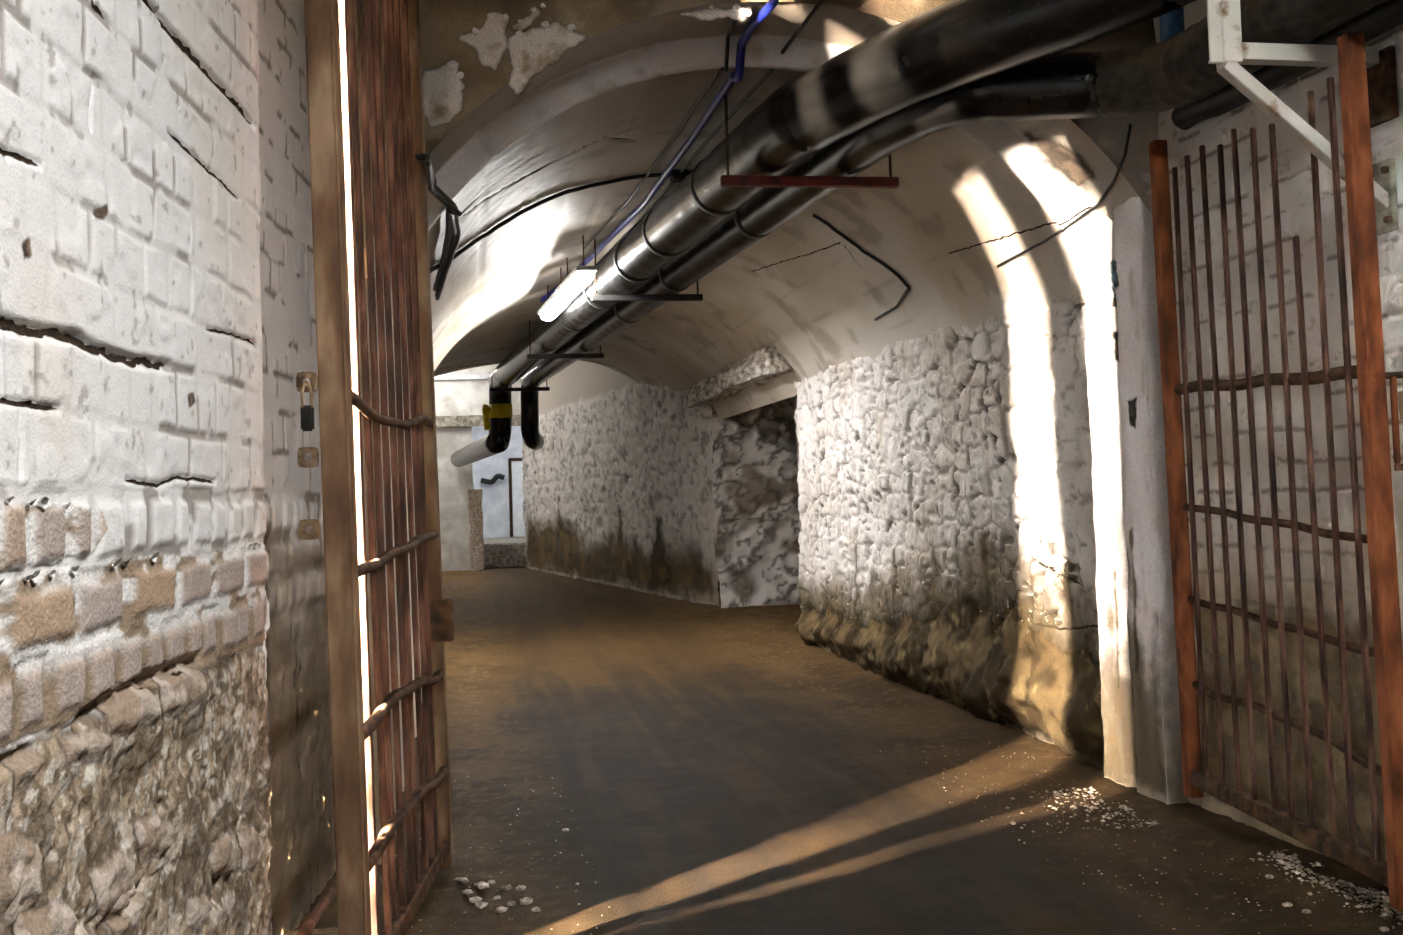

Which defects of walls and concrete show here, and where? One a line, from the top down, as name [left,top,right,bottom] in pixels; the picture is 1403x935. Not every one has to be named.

peeling [422,60,464,126]
peeling [458,3,586,94]
crack [0,317,164,370]
damp [527,496,712,594]
damp [797,529,1170,794]
damp [1192,590,1387,861]